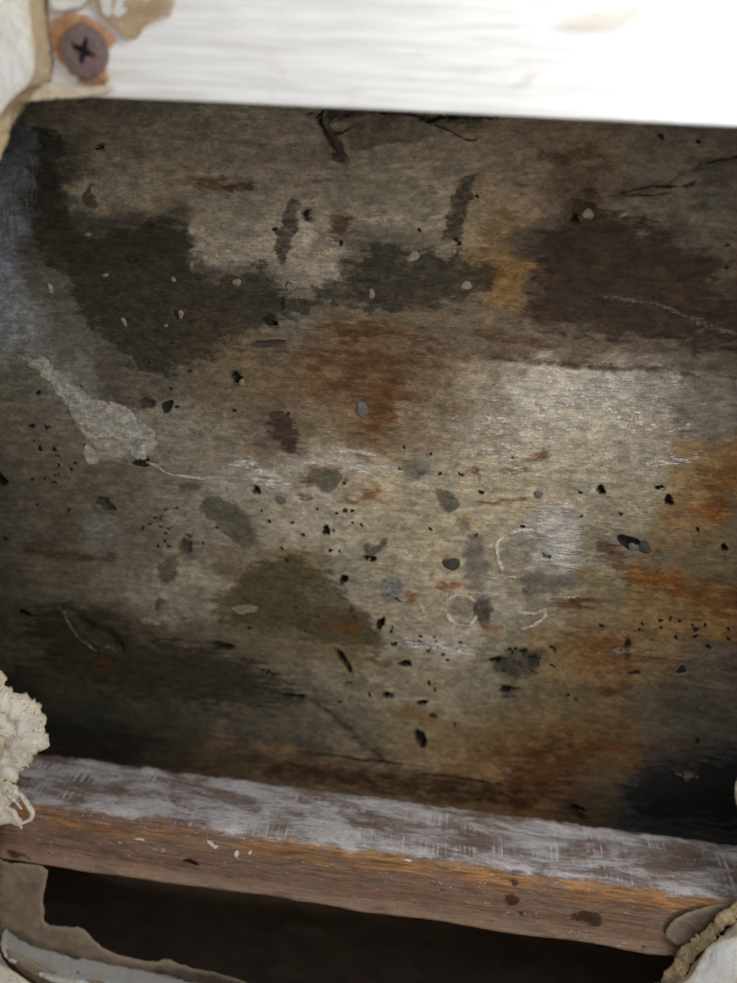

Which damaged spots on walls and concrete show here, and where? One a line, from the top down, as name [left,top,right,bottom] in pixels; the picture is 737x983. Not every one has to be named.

corrosion [49,13,117,86]
crack [304,108,517,164]
water stain [0,127,497,378]
water stain [517,188,737,359]
corrosion [292,321,449,440]
corrosion [265,405,300,454]
flaking render [0,928,196,983]